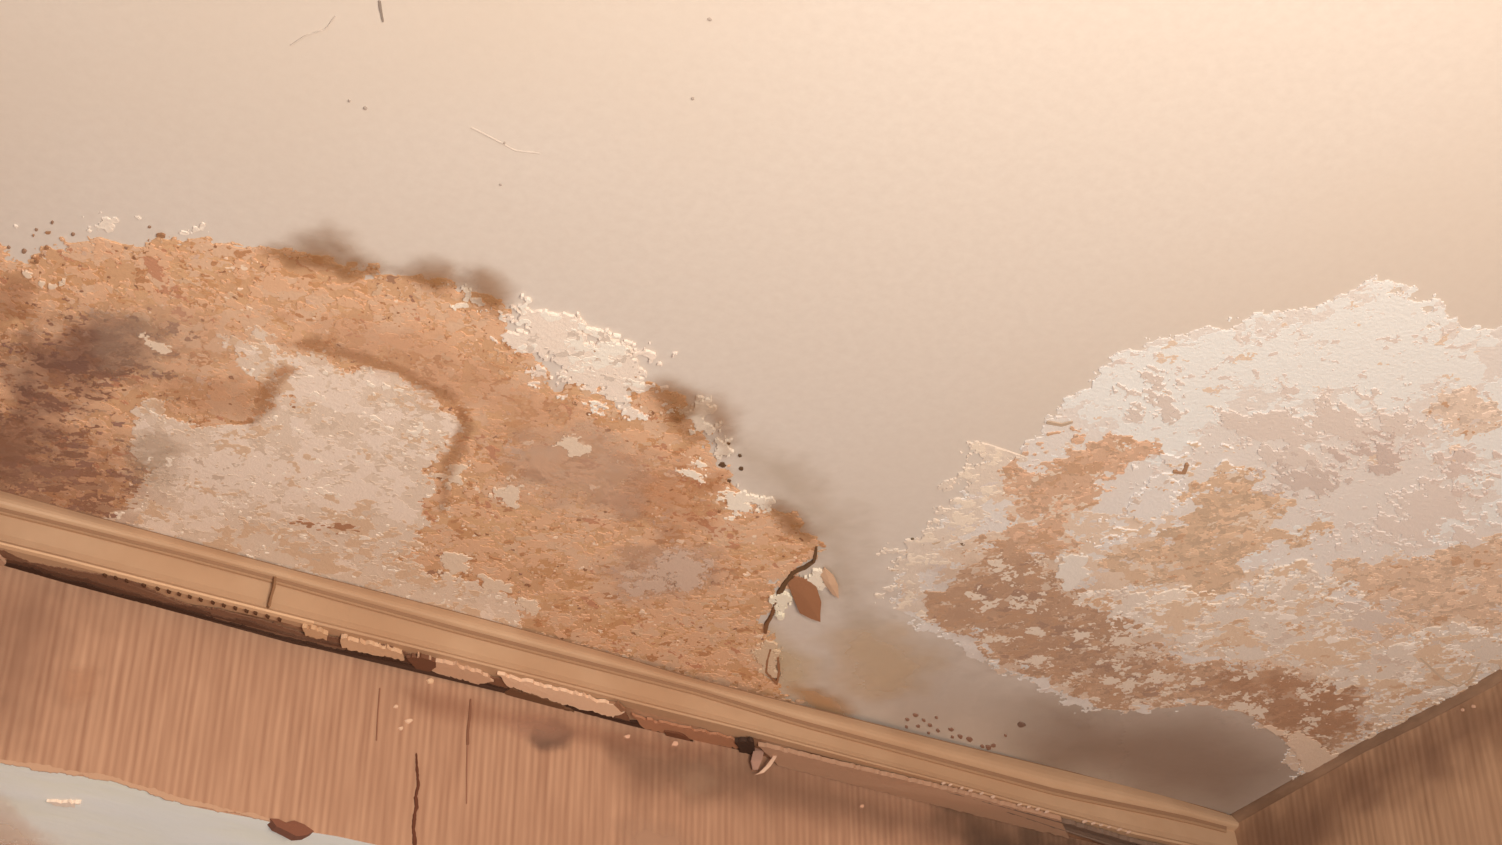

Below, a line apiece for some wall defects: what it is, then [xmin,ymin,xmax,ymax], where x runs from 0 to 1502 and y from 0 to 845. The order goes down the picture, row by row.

peeling [0,212,839,704]
peeling [874,275,1502,780]
crack [4,563,507,804]
peeling [302,624,738,749]
crack [564,705,661,733]
damp [905,713,1026,750]
crack [412,753,420,845]